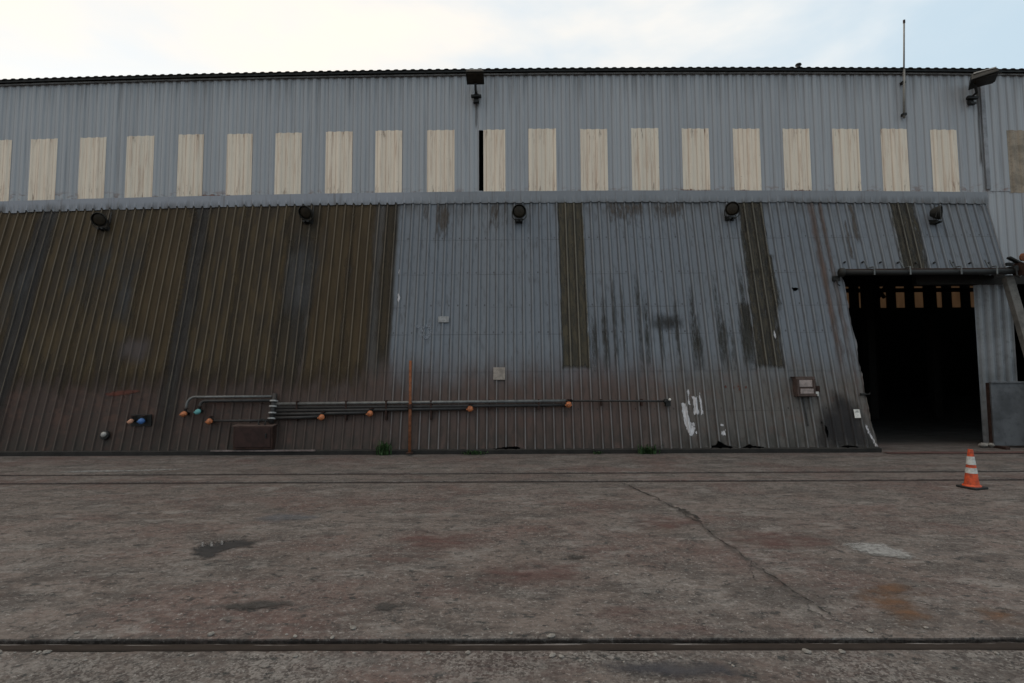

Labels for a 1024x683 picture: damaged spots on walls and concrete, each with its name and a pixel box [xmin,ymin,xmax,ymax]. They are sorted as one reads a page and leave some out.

leakage [592,290,624,360]
leakage [692,330,703,363]
leakage [193,540,254,559]